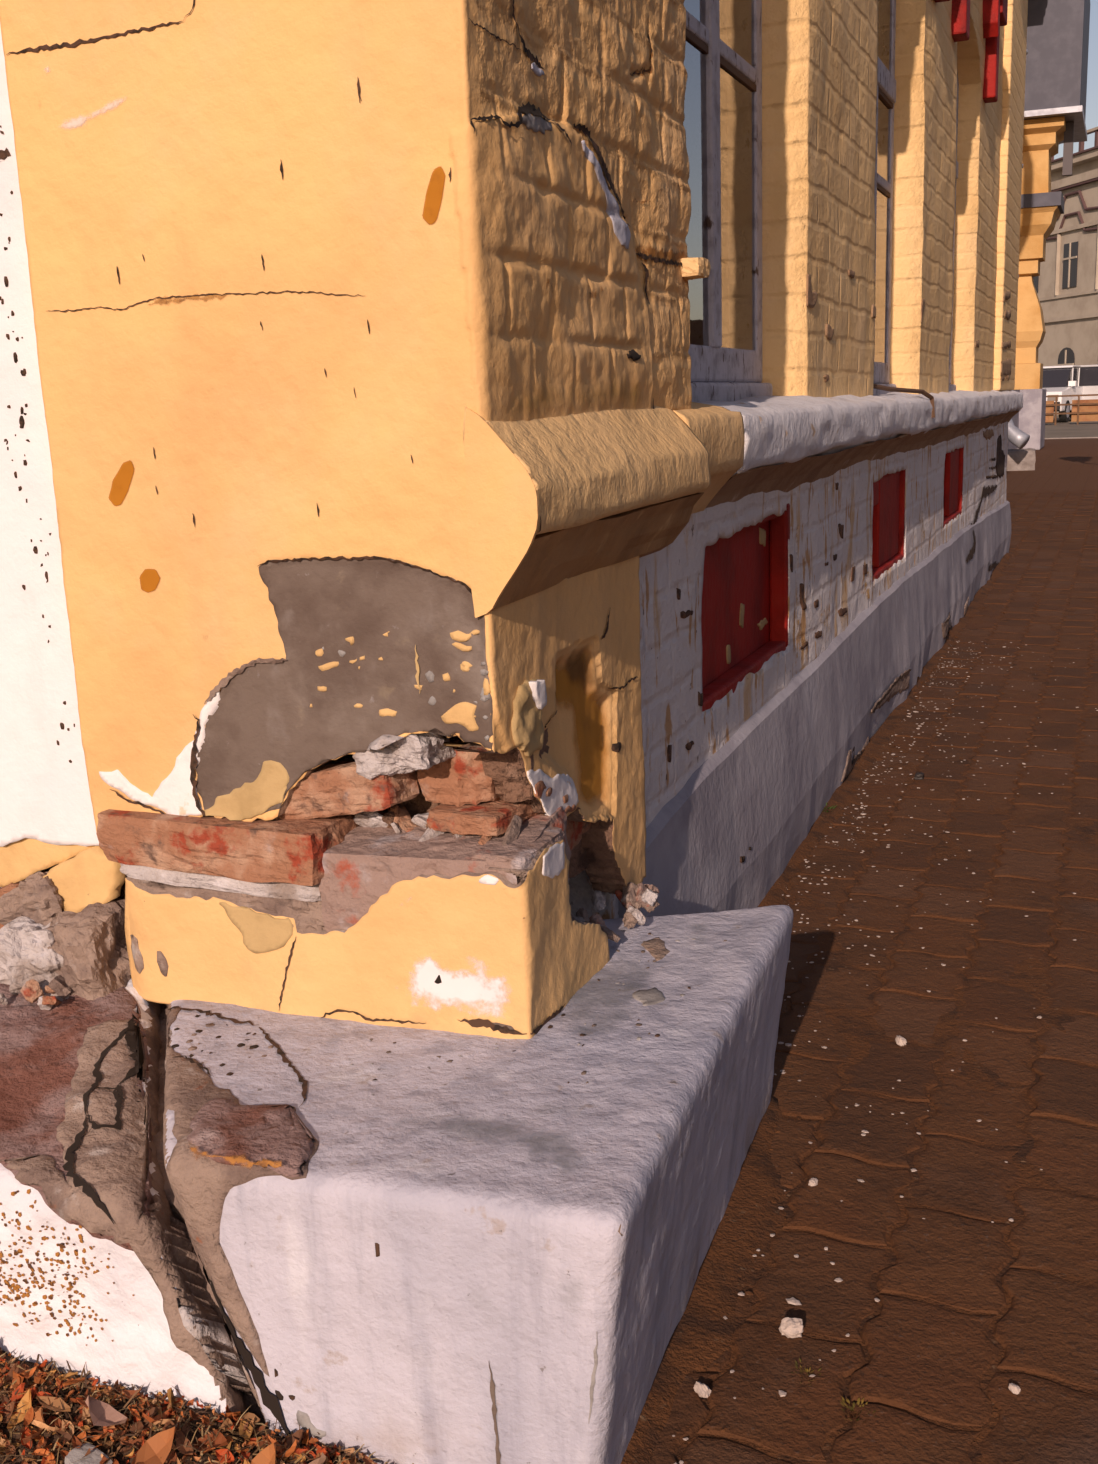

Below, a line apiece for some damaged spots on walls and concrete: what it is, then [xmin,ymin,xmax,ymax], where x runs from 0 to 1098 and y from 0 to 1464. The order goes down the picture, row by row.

crack [6,0,195,55]
crack [0,148,10,159]
crack [469,0,711,302]
peeling [0,276,26,376]
crack [48,290,361,312]
peeling [4,404,30,503]
peeling [0,556,591,1016]
spalling [571,882,696,968]
crack [321,1004,565,1035]
peeling [597,979,691,1040]
crack [62,902,308,1435]